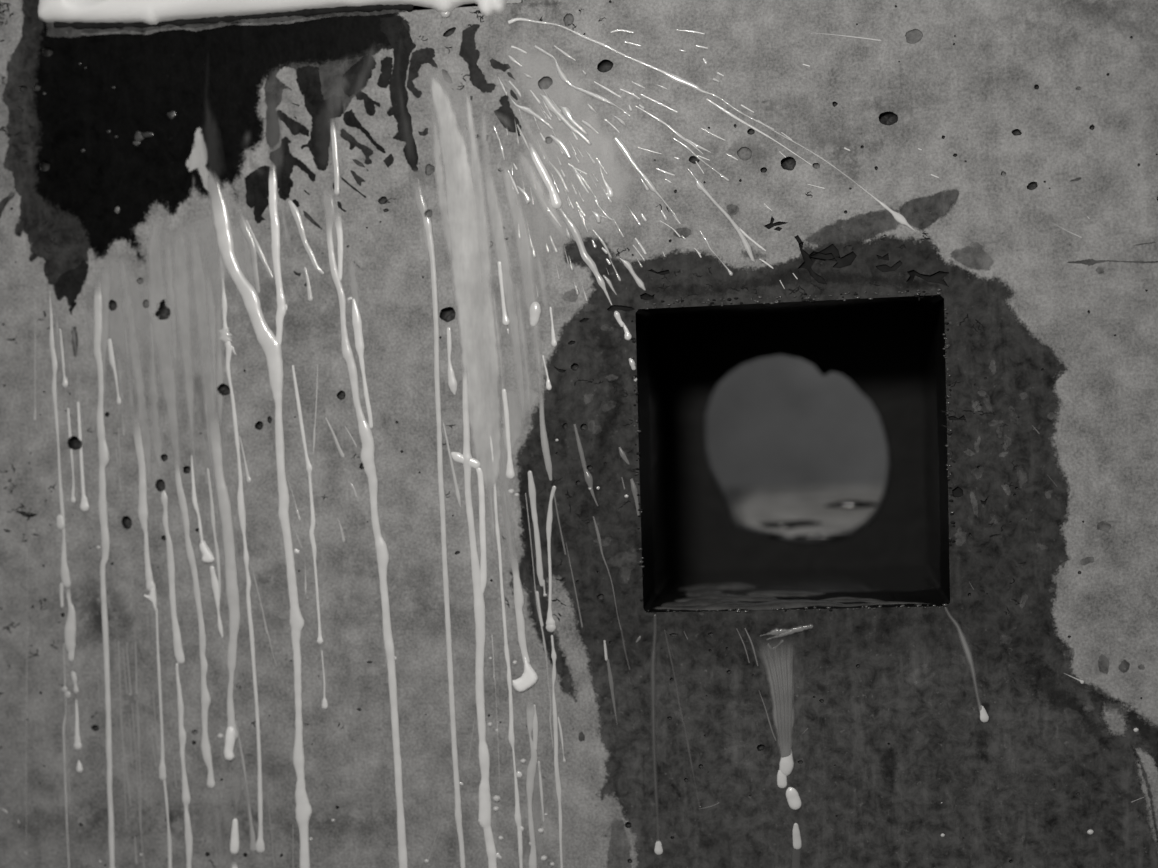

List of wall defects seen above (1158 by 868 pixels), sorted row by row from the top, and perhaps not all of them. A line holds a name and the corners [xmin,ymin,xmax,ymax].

water stain [0,0,452,476]
water stain [459,24,1158,868]